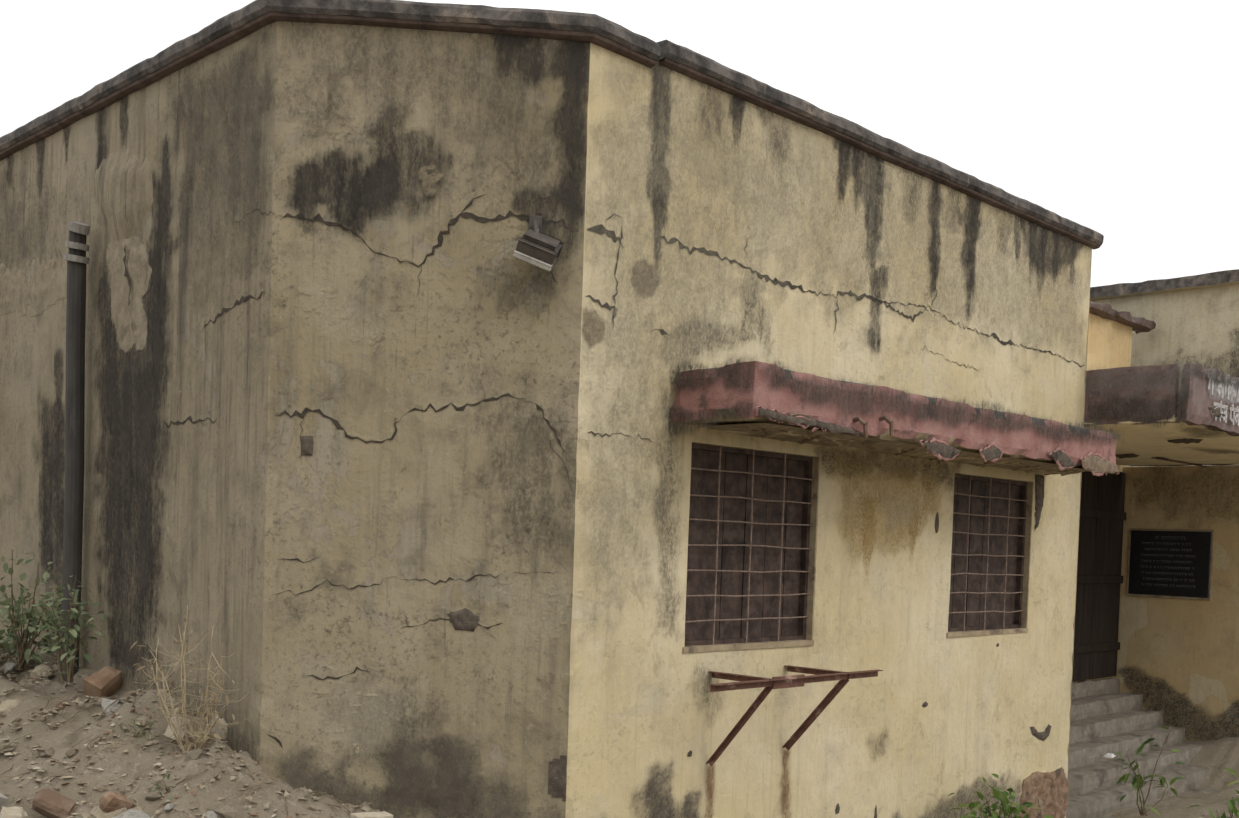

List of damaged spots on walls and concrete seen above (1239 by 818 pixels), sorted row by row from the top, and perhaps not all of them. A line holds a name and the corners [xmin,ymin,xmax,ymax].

peeling [105,236,152,354]
leakage [94,32,270,727]
crack [198,289,266,332]
leakage [288,107,452,236]
crack [275,388,654,488]
crack [231,193,1086,371]
leakage [647,59,671,265]
leakage [835,138,887,350]
spalling [699,406,1143,532]
leakage [906,169,980,312]
leakage [657,283,1239,627]
leakage [1001,213,1083,288]